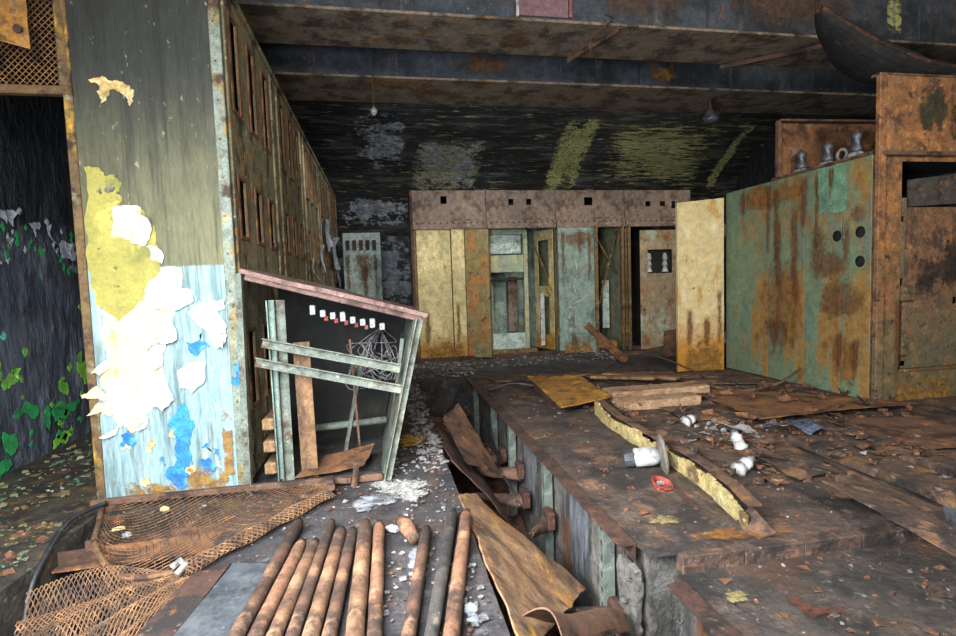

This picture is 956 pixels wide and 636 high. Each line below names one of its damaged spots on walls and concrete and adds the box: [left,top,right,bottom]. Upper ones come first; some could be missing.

peeling [88,76,134,108]
efflorescence [355,115,405,168]
water stain [414,142,483,191]
water stain [545,119,600,190]
water stain [596,123,736,188]
rust [561,232,591,279]
rust [741,179,864,354]
peeling [0,166,227,511]
rust [565,333,593,353]
peeling [0,521,62,568]